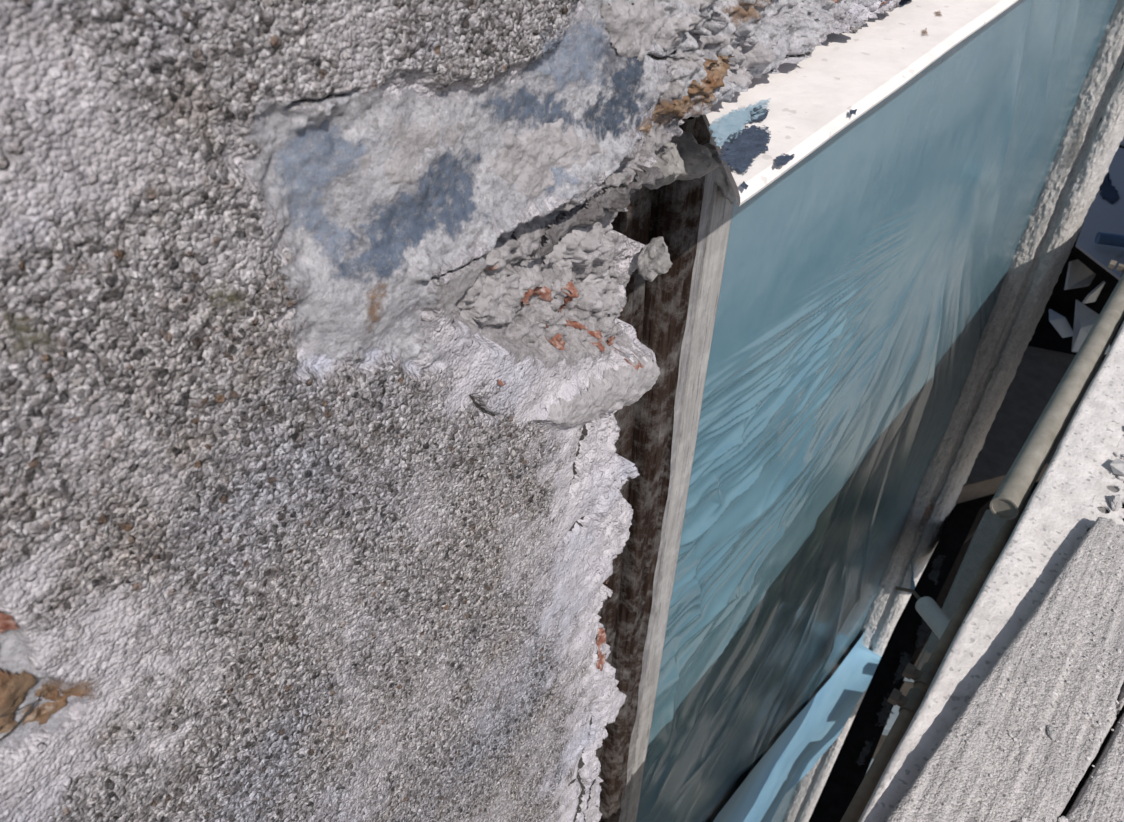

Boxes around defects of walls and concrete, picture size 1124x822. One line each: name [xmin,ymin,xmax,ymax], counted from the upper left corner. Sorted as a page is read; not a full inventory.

spalling [244,0,912,376]
spalling [0,612,89,748]
spalling [596,627,607,671]